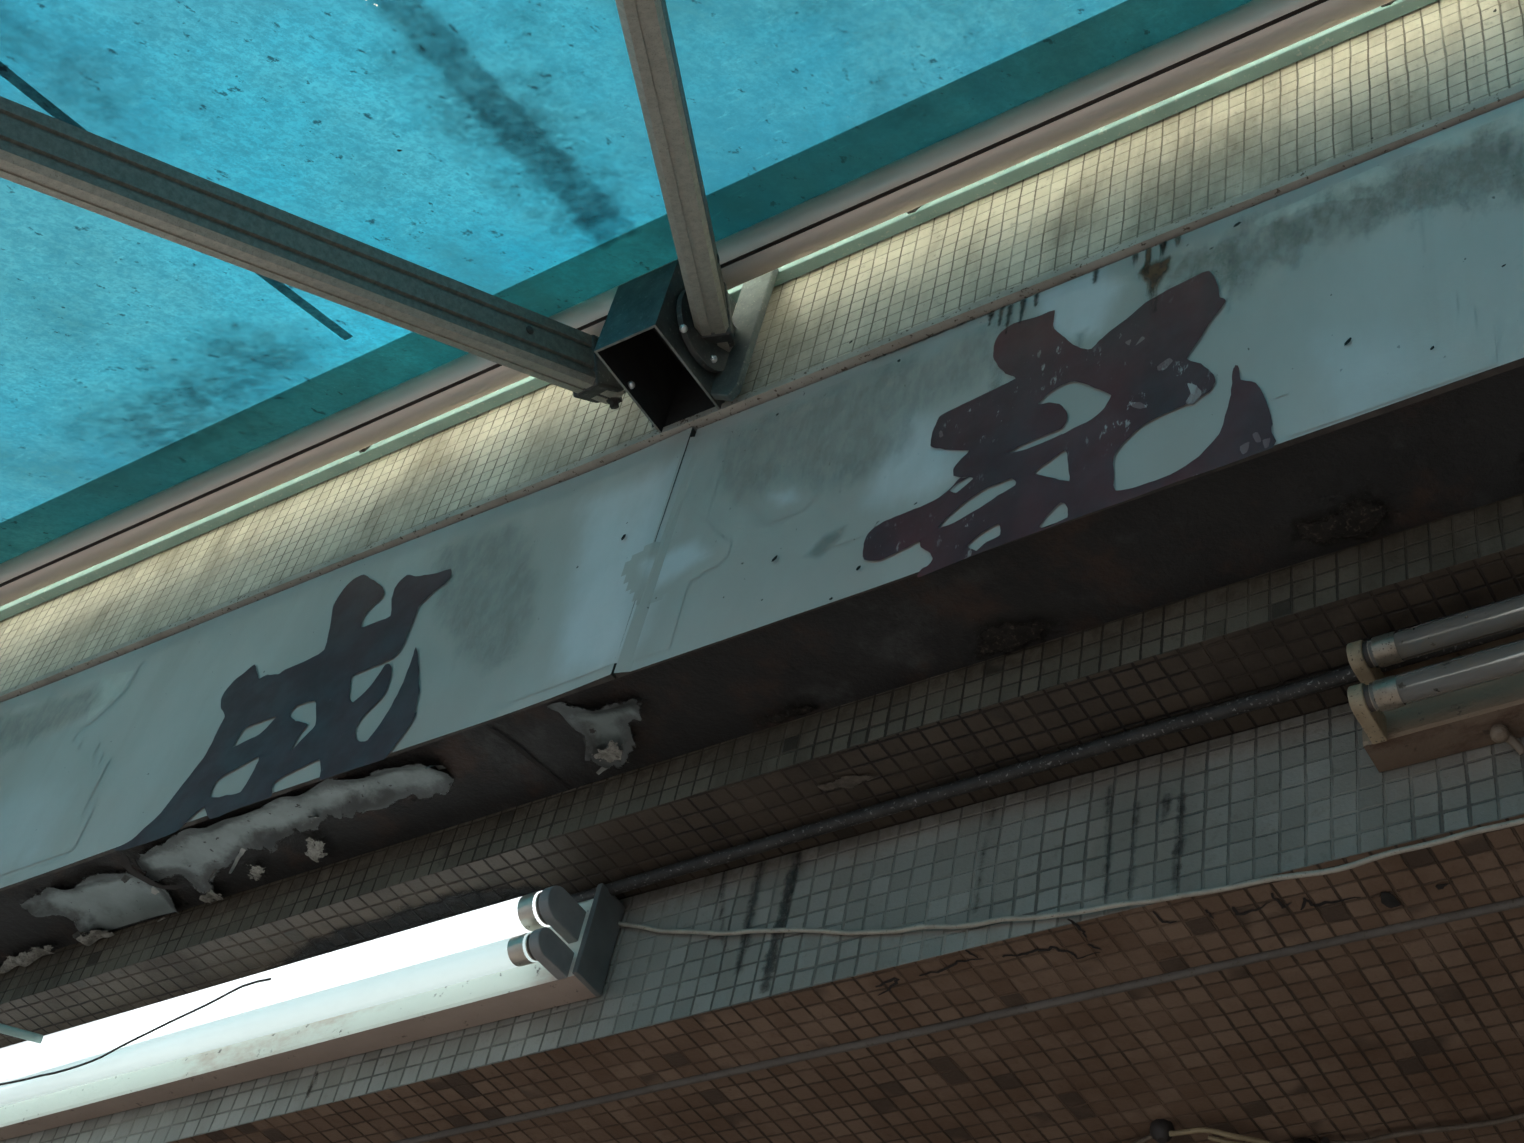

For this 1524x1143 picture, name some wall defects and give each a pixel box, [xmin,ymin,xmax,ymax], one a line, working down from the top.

peeling [546,698,642,775]
peeling [18,763,455,946]
peeling [0,945,54,973]
leakage [736,863,762,971]
leakage [761,853,801,992]